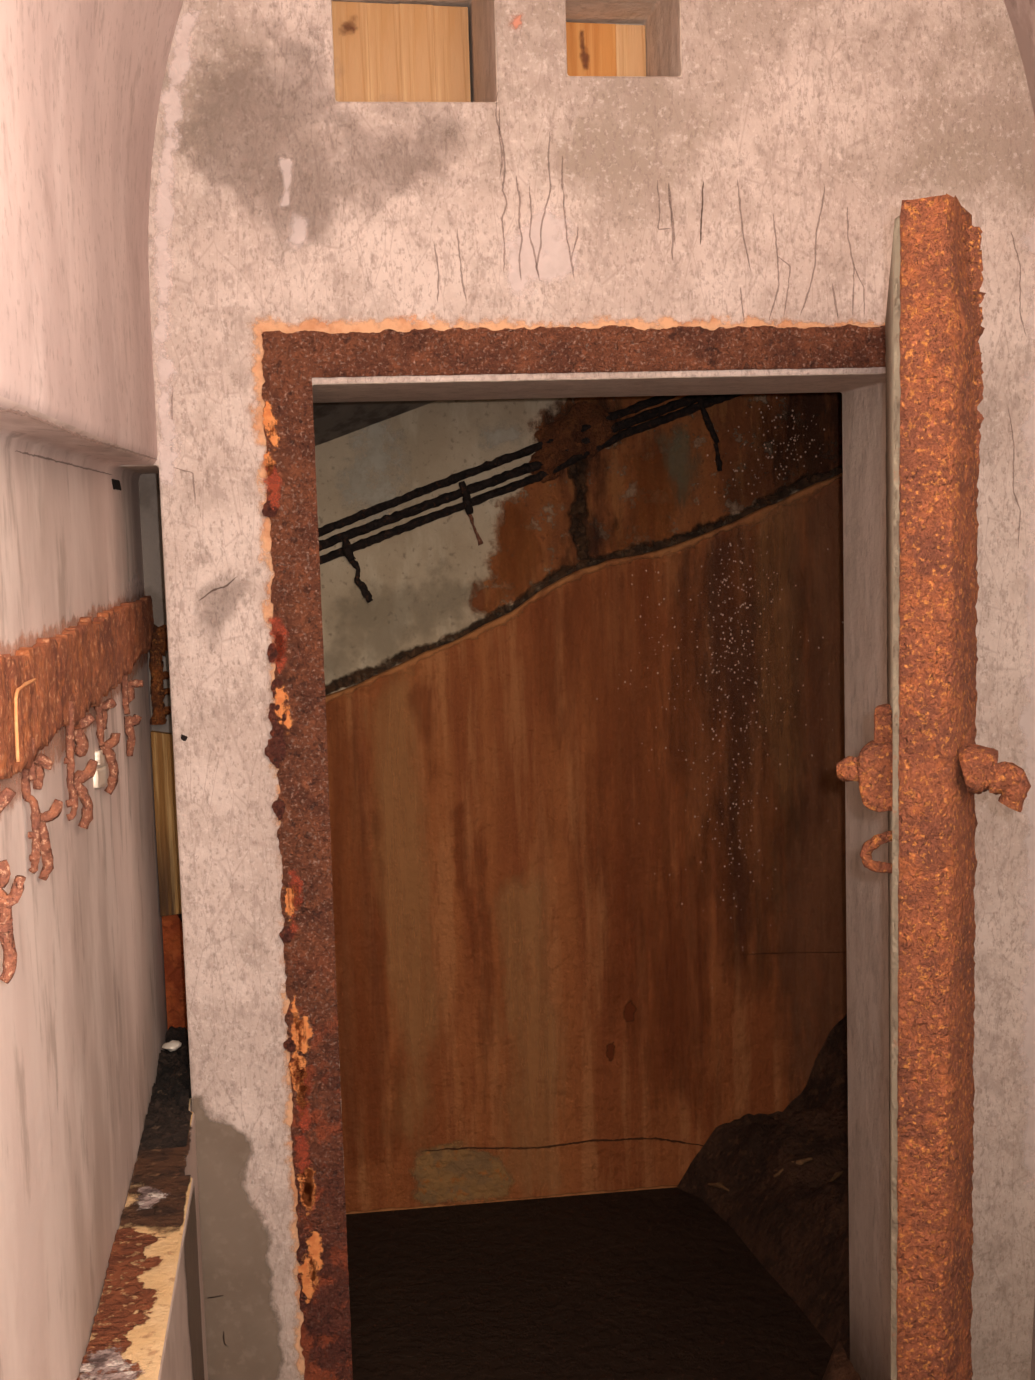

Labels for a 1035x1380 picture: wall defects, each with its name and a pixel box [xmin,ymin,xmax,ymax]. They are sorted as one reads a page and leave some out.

crack [698,182,706,244]
rust [963,225,984,465]
rust [251,315,885,733]
rust [282,871,303,938]
rust [326,392,847,1213]
peeling [136,1186,169,1210]
rust [281,987,323,1375]
peeling [80,1347,141,1380]